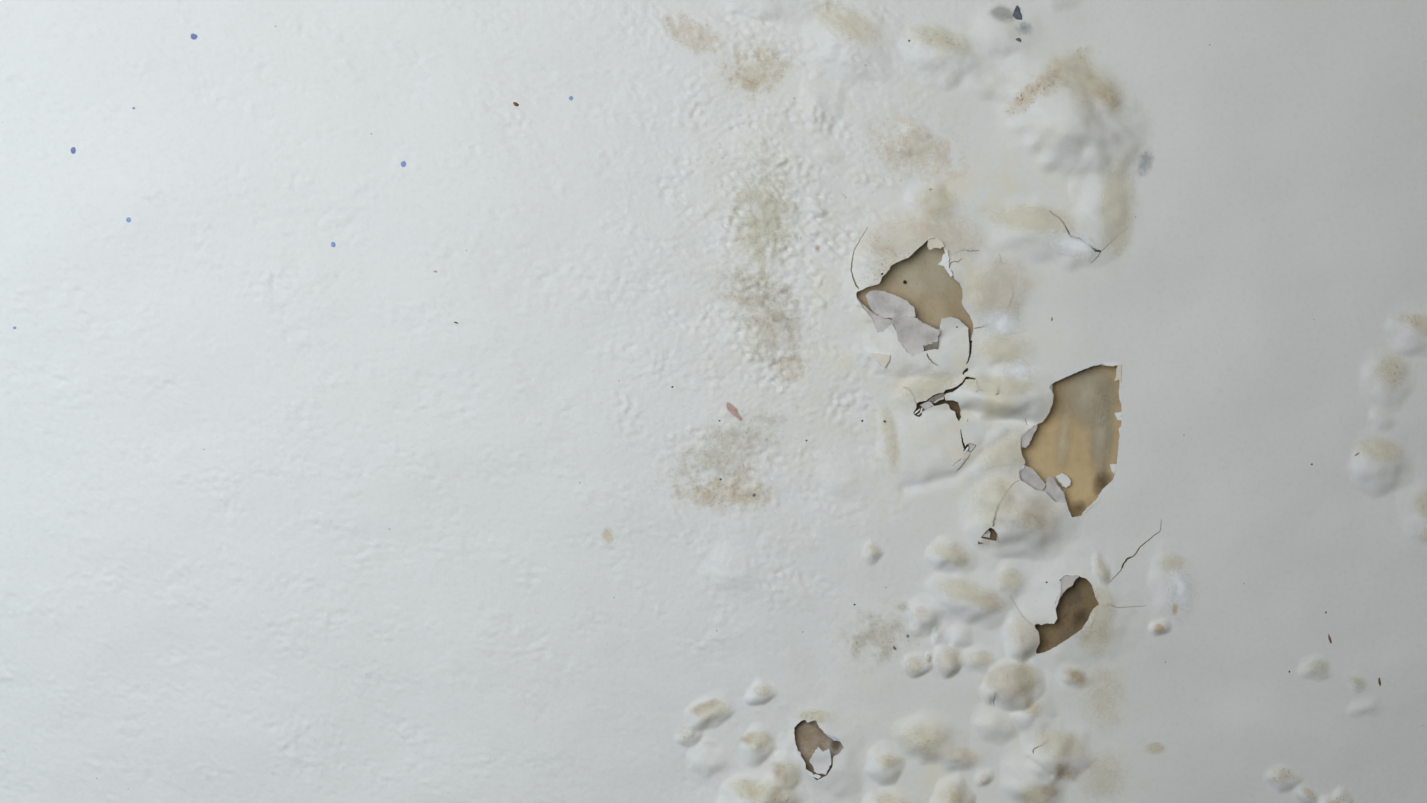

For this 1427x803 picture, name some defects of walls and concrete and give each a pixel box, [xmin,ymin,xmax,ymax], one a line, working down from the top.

spalling [844,201,989,356]
spalling [1019,363,1122,517]
spalling [1018,536,1153,667]
spalling [779,695,866,789]